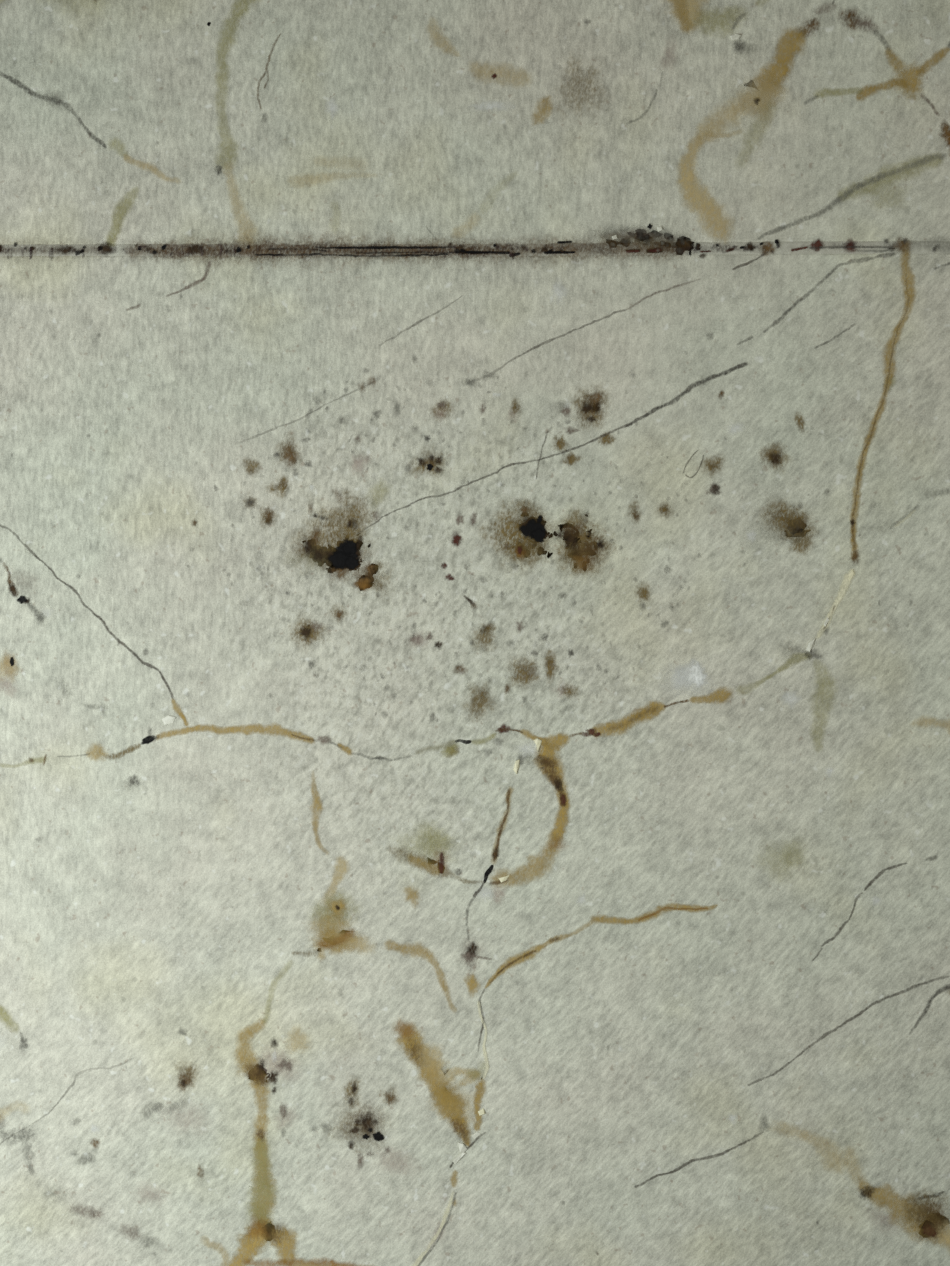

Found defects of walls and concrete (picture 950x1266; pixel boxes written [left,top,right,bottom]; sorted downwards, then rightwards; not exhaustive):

water stain [562,394,602,422]
water stain [417,456,441,472]
water stain [301,493,381,588]
water stain [491,503,608,570]
crack [6,567,43,619]
crack [35,555,386,759]
water stain [295,623,319,643]
crack [446,690,730,896]
crack [782,984,949,1069]
crack [413,943,489,1266]
water stain [349,1114,388,1164]
crack [635,1122,765,1187]